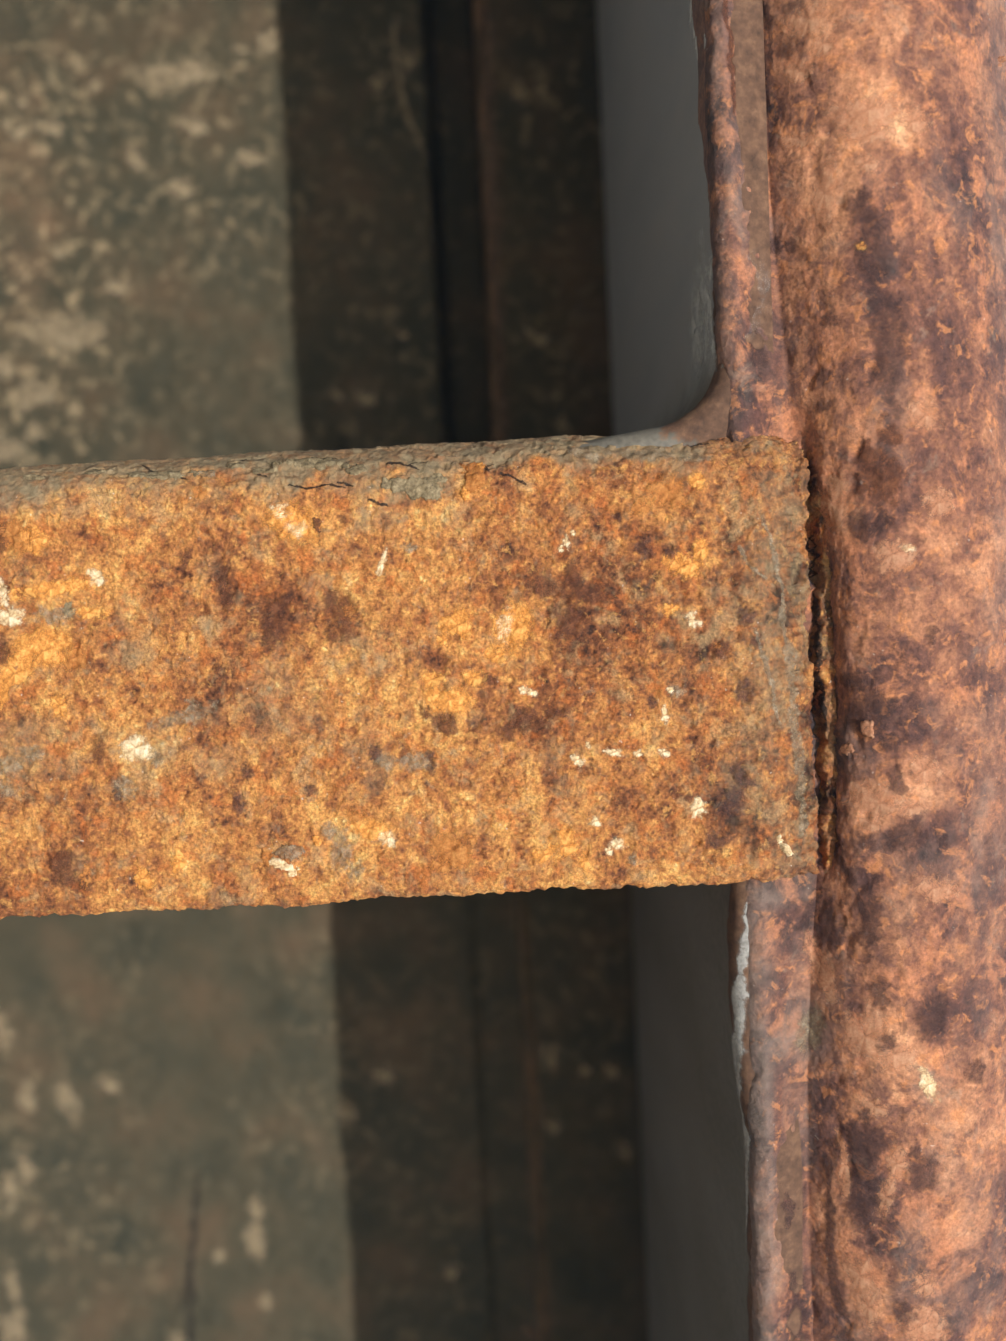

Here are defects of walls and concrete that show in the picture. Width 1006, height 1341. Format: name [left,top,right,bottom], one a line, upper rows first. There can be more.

corrosion [0,576,111,710]
corrosion [263,500,322,544]
corrosion [420,601,533,735]
corrosion [636,539,709,578]
corrosion [662,603,702,628]
crack [805,535,828,728]
corrosion [809,400,935,573]
corrosion [261,835,321,877]
corrosion [685,794,706,818]
crack [818,809,867,918]
corrosion [843,982,936,1098]
corrosion [827,1098,938,1230]